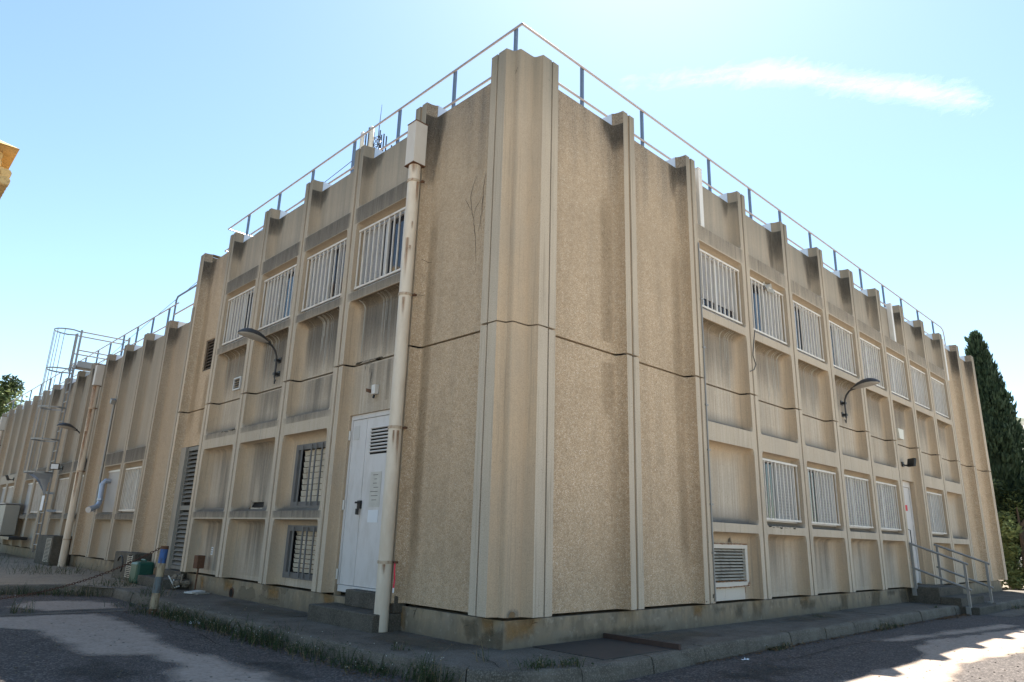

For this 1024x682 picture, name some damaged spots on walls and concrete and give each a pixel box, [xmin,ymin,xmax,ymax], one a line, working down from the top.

crack [466,176,486,269]
damp [767,229,782,256]